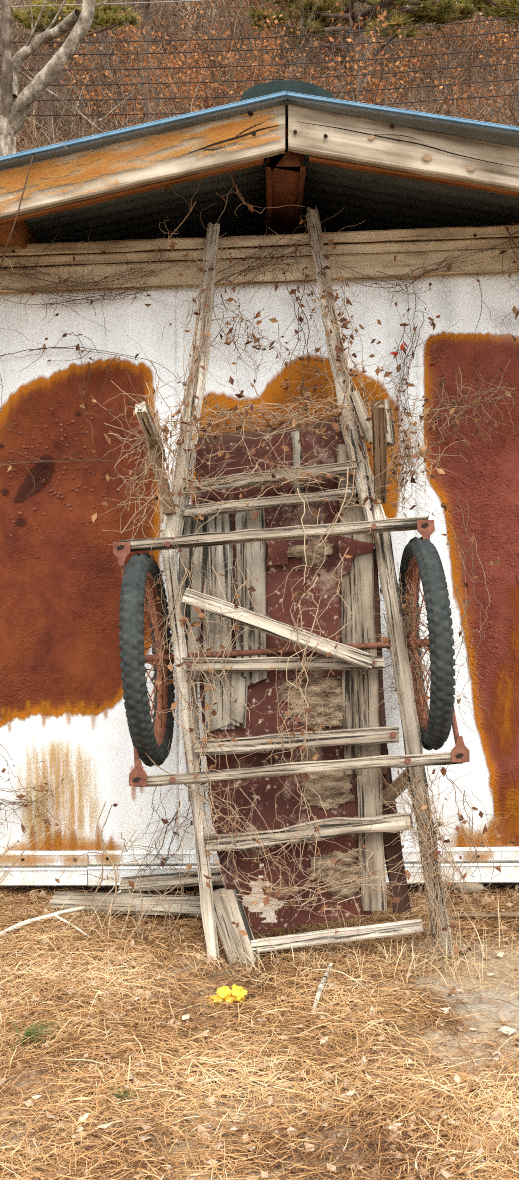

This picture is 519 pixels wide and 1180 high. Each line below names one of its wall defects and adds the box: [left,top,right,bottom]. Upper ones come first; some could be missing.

rust [197,355,339,444]
rust [352,369,401,518]
rust [0,358,162,727]
rust [424,331,519,861]
rust [0,748,120,866]